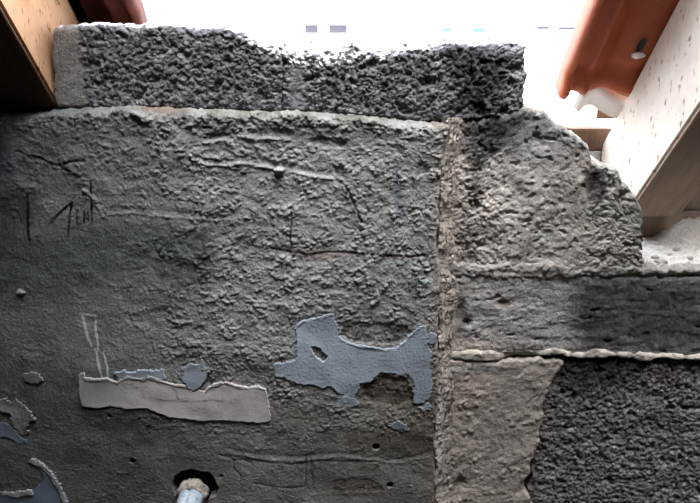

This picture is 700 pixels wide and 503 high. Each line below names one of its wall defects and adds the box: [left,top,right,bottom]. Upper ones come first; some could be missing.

crack [336,179,362,222]
crack [284,216,436,258]
peeling [273,313,437,412]
flaking render [78,356,271,423]
flaking render [0,398,37,444]
peeling [0,458,69,503]